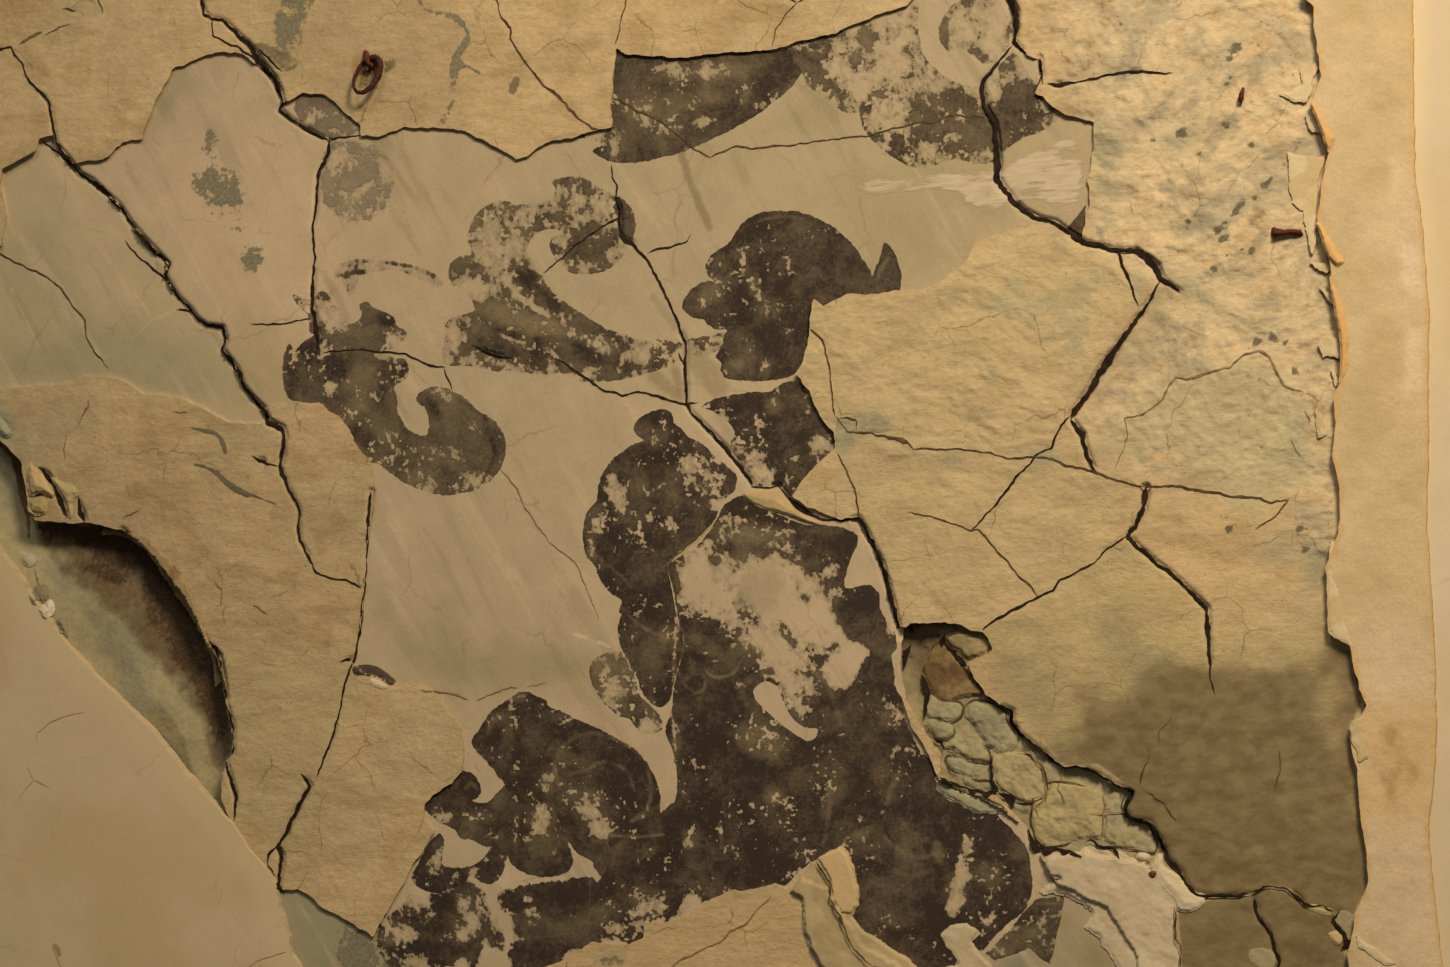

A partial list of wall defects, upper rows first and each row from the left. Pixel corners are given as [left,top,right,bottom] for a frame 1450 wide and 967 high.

crack [496,0,603,132]
crack [0,0,452,895]
crack [545,0,1310,693]
peeling [1280,63,1349,386]
flaking render [0,447,233,811]
peeling [280,762,637,967]
peeling [600,823,714,945]
crack [816,861,876,967]
peeling [782,834,917,967]
peeling [944,833,1014,941]
crack [939,695,1350,967]
leakage [1079,647,1366,967]